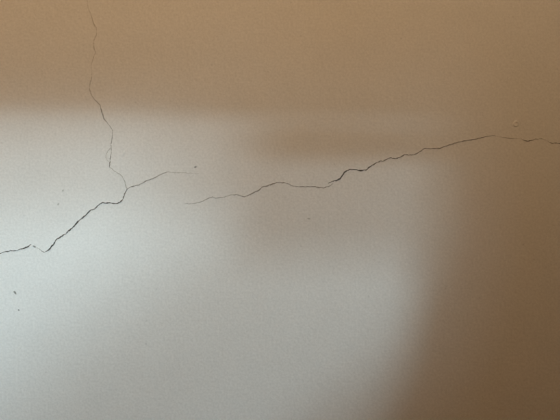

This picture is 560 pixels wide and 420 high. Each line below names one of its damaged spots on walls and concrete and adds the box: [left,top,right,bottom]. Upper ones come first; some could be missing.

crack [0,0,199,255]
crack [184,135,560,205]